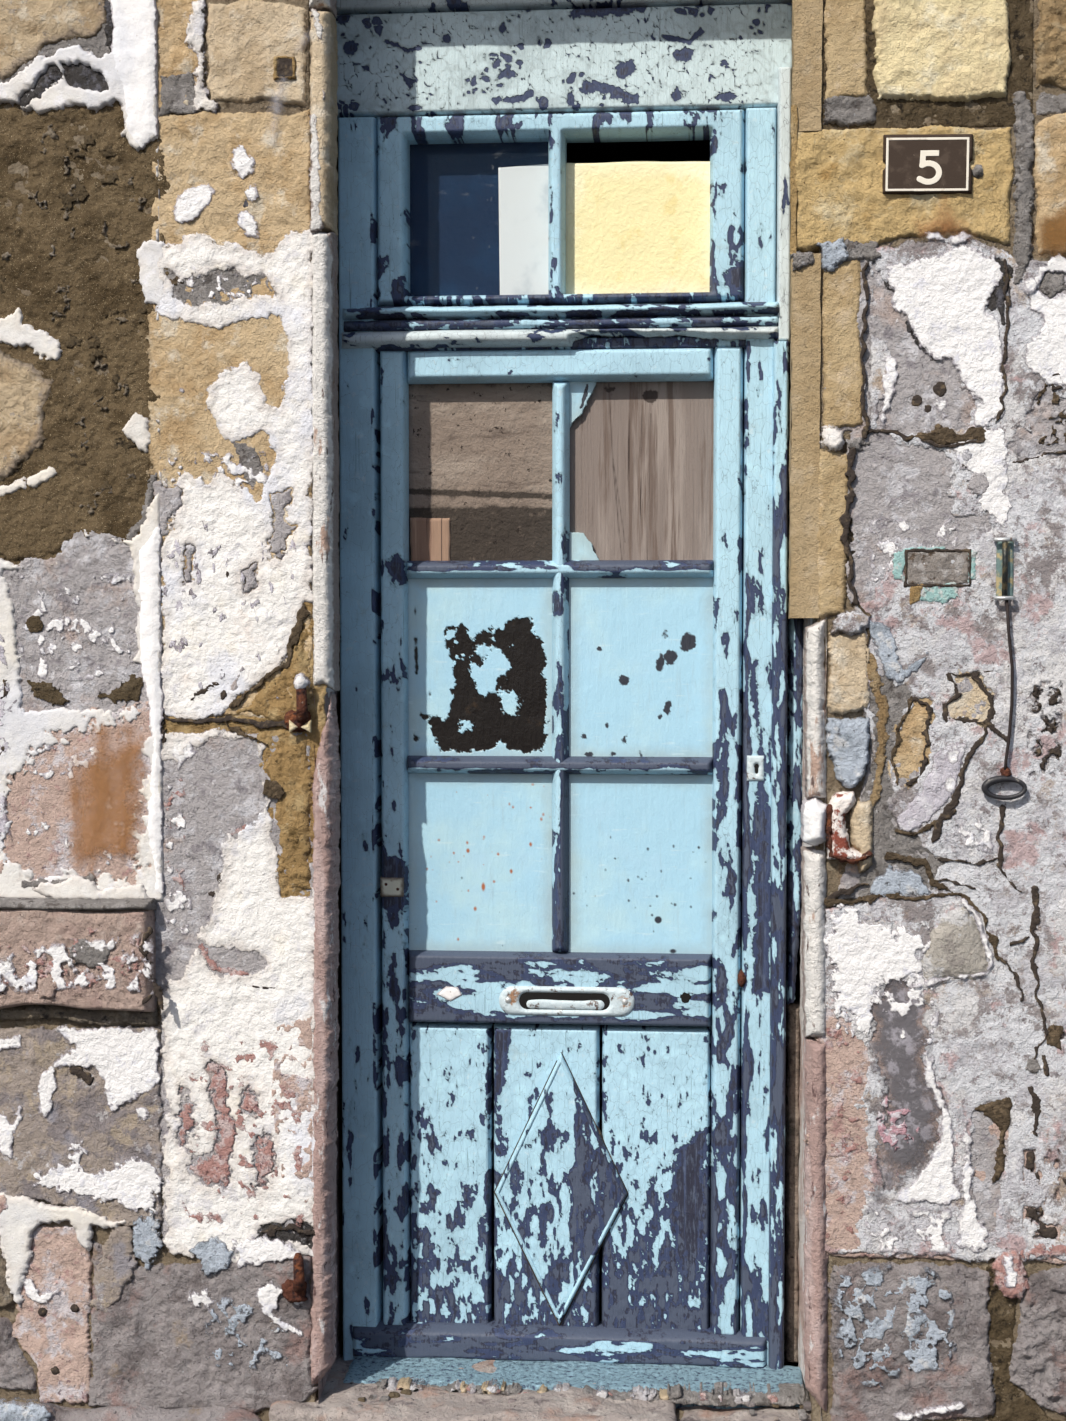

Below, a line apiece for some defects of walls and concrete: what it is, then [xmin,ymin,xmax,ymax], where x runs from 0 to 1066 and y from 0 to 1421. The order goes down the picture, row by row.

flaking render [0,0,327,999]
peeling [845,231,1066,604]
peeling [803,620,1066,1387]
crack [824,718,1049,1060]
peeling [179,1016,315,1369]
peeling [894,1402,965,1421]